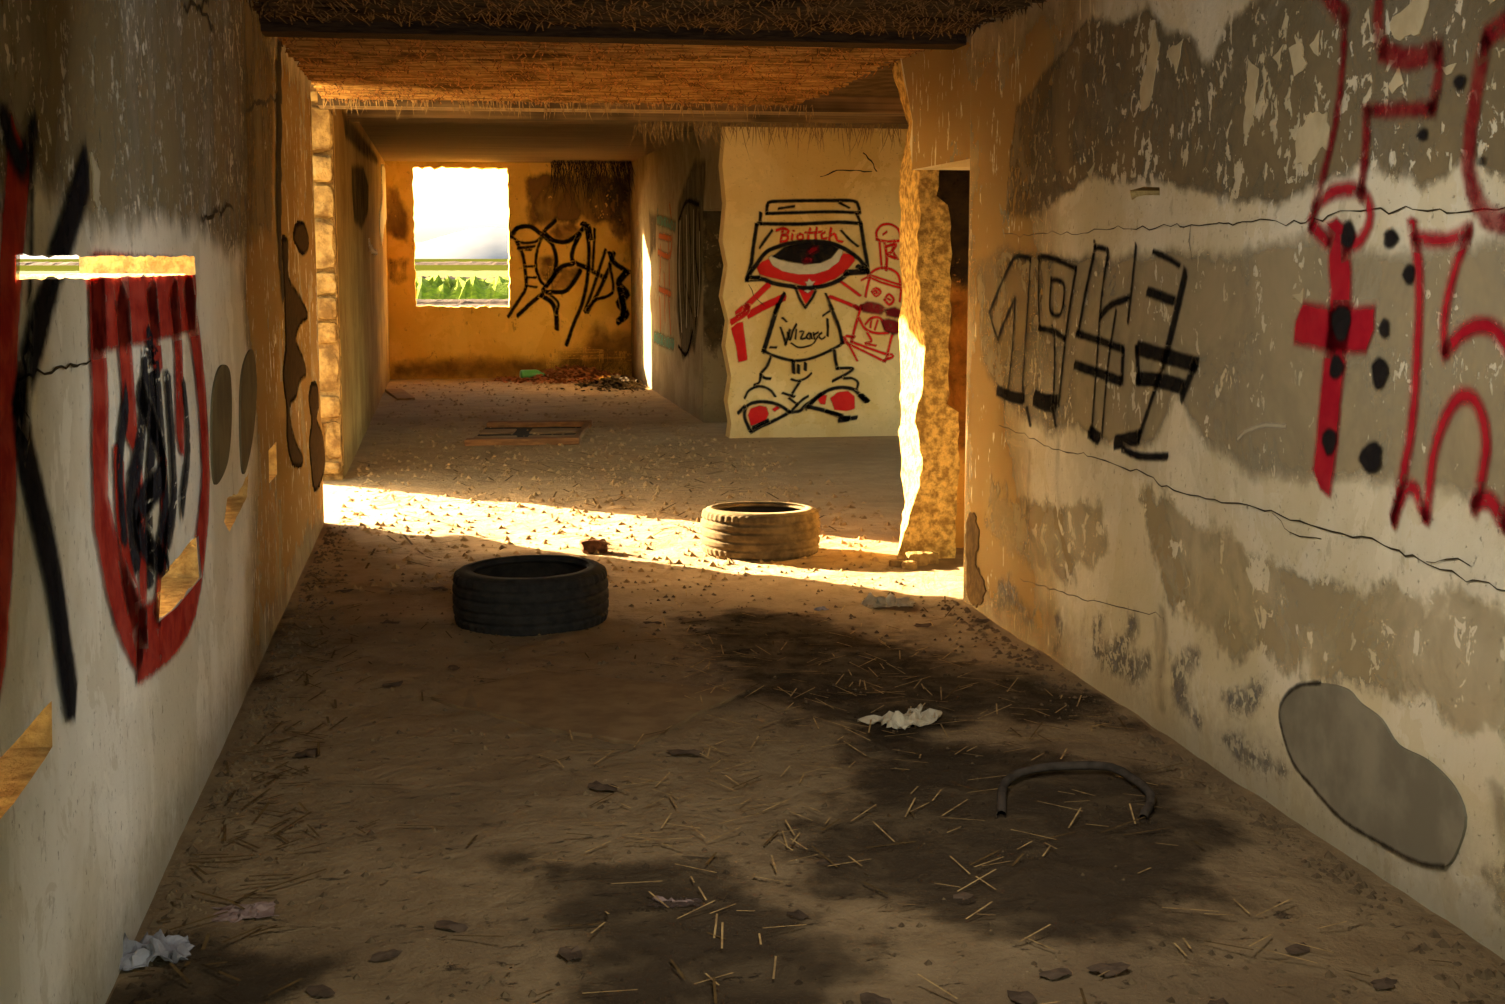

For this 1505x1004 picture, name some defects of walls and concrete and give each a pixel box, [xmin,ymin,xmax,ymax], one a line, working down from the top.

peeling [1007,0,1505,216]
crack [1005,206,1505,258]
crack [999,425,1505,591]
crack [1021,579,1161,618]